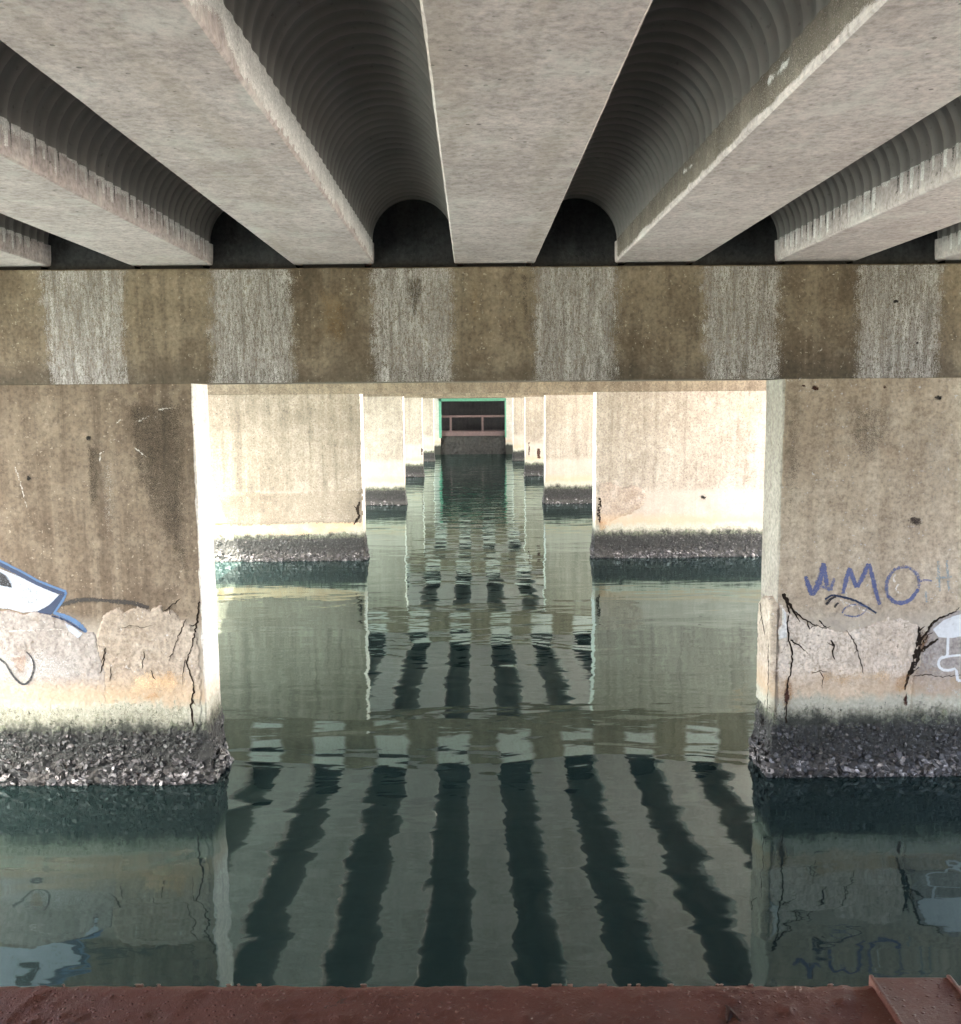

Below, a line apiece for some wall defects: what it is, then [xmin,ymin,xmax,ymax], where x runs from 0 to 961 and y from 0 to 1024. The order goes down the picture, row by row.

damp [518,267,631,381]
damp [689,266,800,381]
damp [833,265,958,378]
spalling [0,605,203,733]
crack [100,598,200,727]
crack [760,593,864,723]
spalling [774,603,961,726]
crack [904,608,959,690]